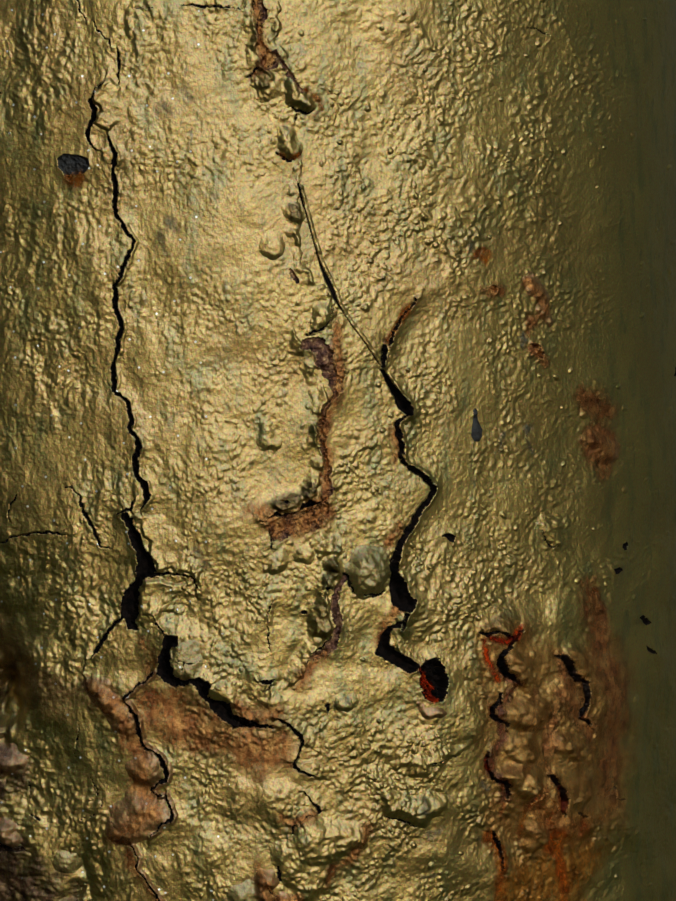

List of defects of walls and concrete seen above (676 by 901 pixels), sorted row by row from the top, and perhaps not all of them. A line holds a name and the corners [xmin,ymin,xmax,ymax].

rust [251,0,275,77]
peeling [57,154,89,176]
crack [65,0,322,901]
rust [244,322,345,538]
crack [297,183,437,674]
crack [1,488,66,543]
crack [479,630,525,733]
crack [550,654,593,746]
crack [483,752,588,818]
rust [481,624,627,901]
crack [491,831,505,872]